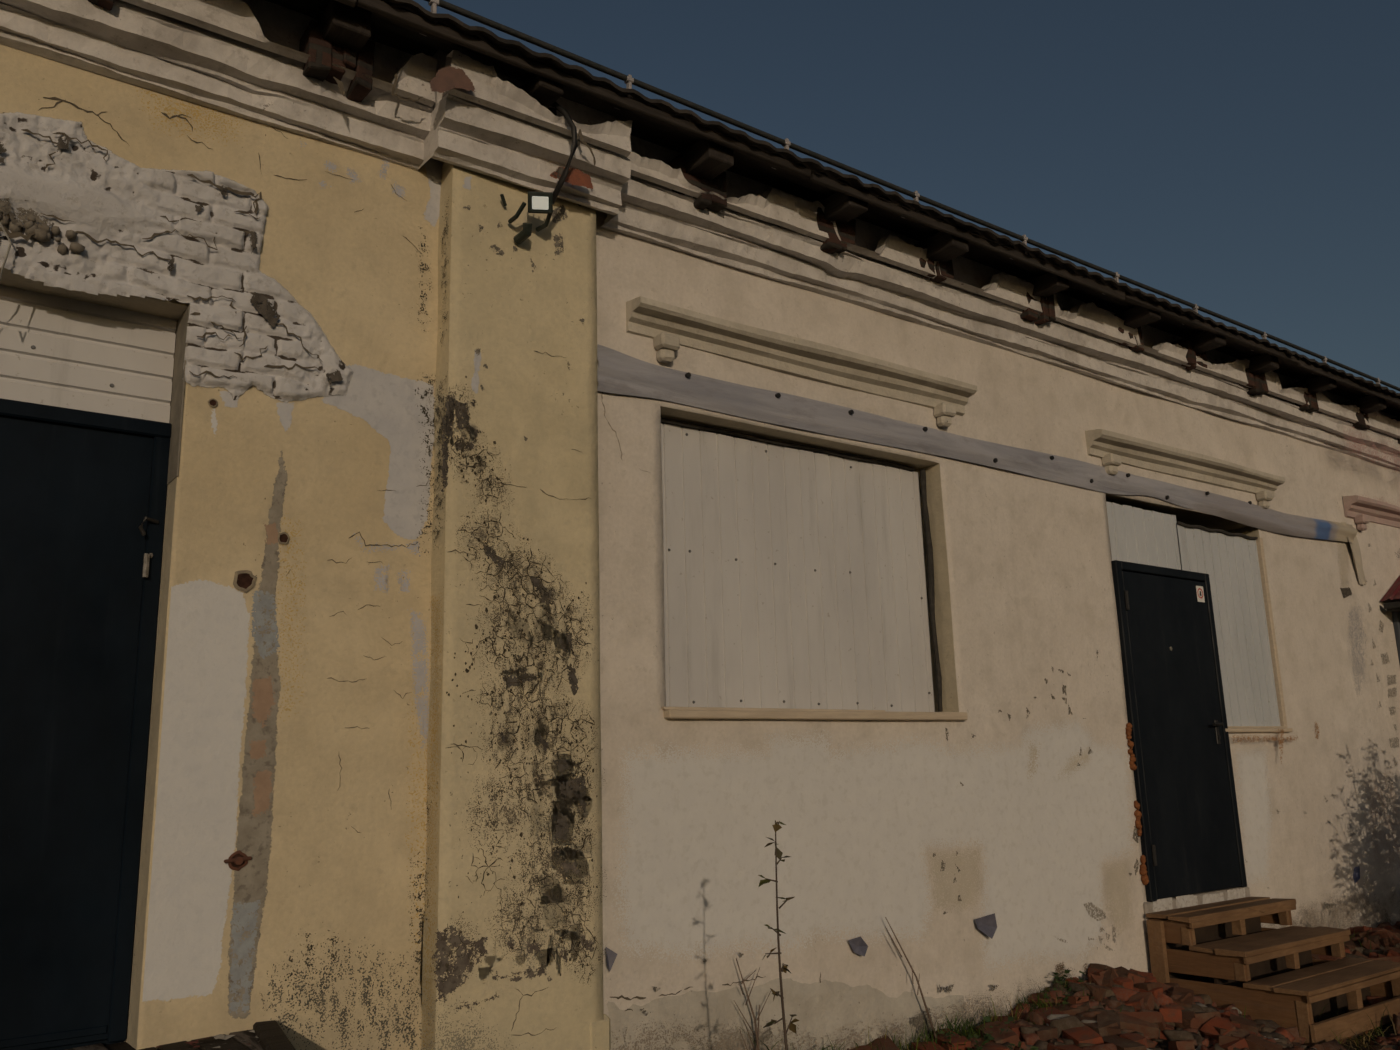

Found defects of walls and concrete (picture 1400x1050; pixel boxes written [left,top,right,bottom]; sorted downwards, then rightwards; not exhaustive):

spalling [0,112,435,751]
peeling [142,570,280,1013]
leakage [260,782,533,1050]